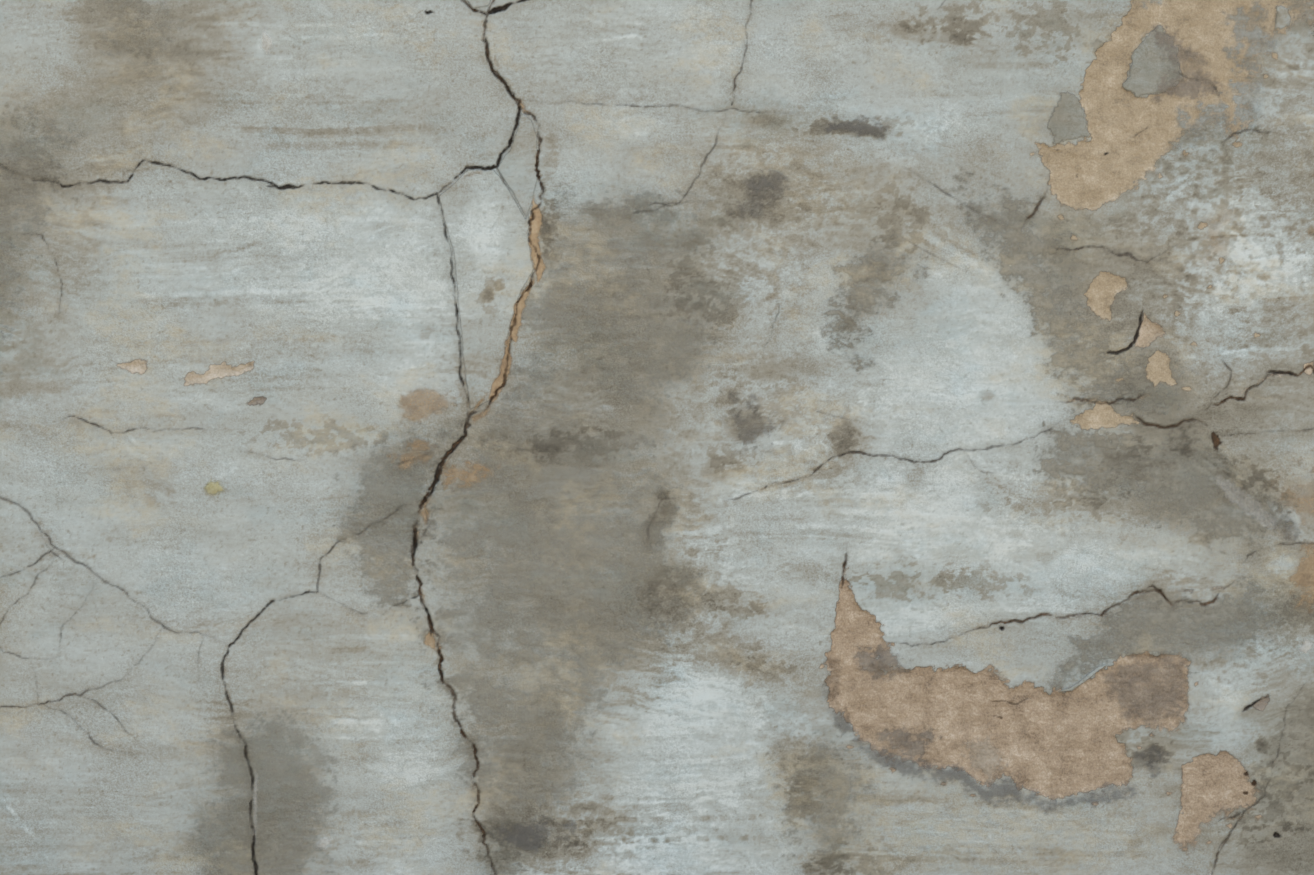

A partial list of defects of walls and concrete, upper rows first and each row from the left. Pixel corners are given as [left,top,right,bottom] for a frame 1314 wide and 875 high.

flaking render [1030,0,1314,220]
crack [60,0,545,875]
leakage [823,235,928,371]
flaking render [1084,271,1127,321]
flaking render [1107,313,1191,391]
crack [1074,364,1314,428]
leakage [339,432,450,607]
crack [1,691,117,719]
leakage [432,362,688,874]
flaking render [820,558,1198,806]
crack [973,585,1217,630]
flaking render [1166,751,1262,851]